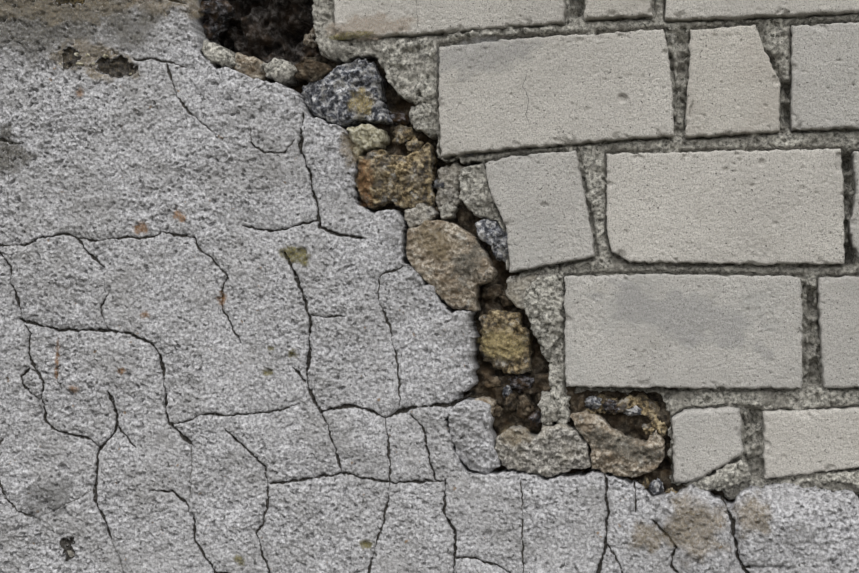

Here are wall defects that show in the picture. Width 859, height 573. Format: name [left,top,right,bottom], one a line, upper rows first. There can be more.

crack [134,58,212,131]
spalling [298,56,345,68]
spalling [361,58,482,194]
crack [244,113,365,239]
spalling [377,203,407,214]
spalling [433,188,551,436]
crack [0,231,524,573]
spalling [566,386,686,495]
crack [596,474,623,573]
crack [633,482,679,573]
crack [720,494,751,573]